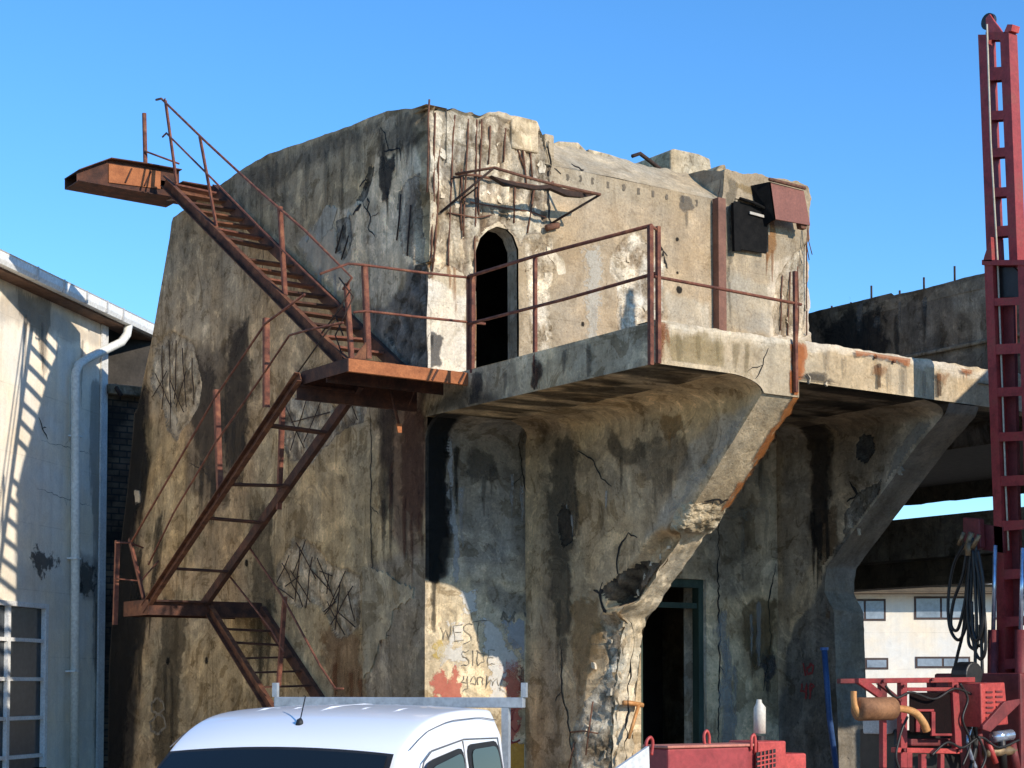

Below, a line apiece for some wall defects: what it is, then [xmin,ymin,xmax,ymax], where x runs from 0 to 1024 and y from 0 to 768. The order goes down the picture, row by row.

leakage [378,152,395,211]
spalling [384,99,566,368]
spalling [150,332,202,441]
spalling [276,536,414,678]
leakage [429,417,498,631]
leakage [546,437,579,667]
spalling [568,546,671,768]
crack [704,499,729,743]
corrosion [722,342,808,511]
leakage [800,424,834,584]
spalling [856,434,875,464]
corrosion [855,350,910,388]